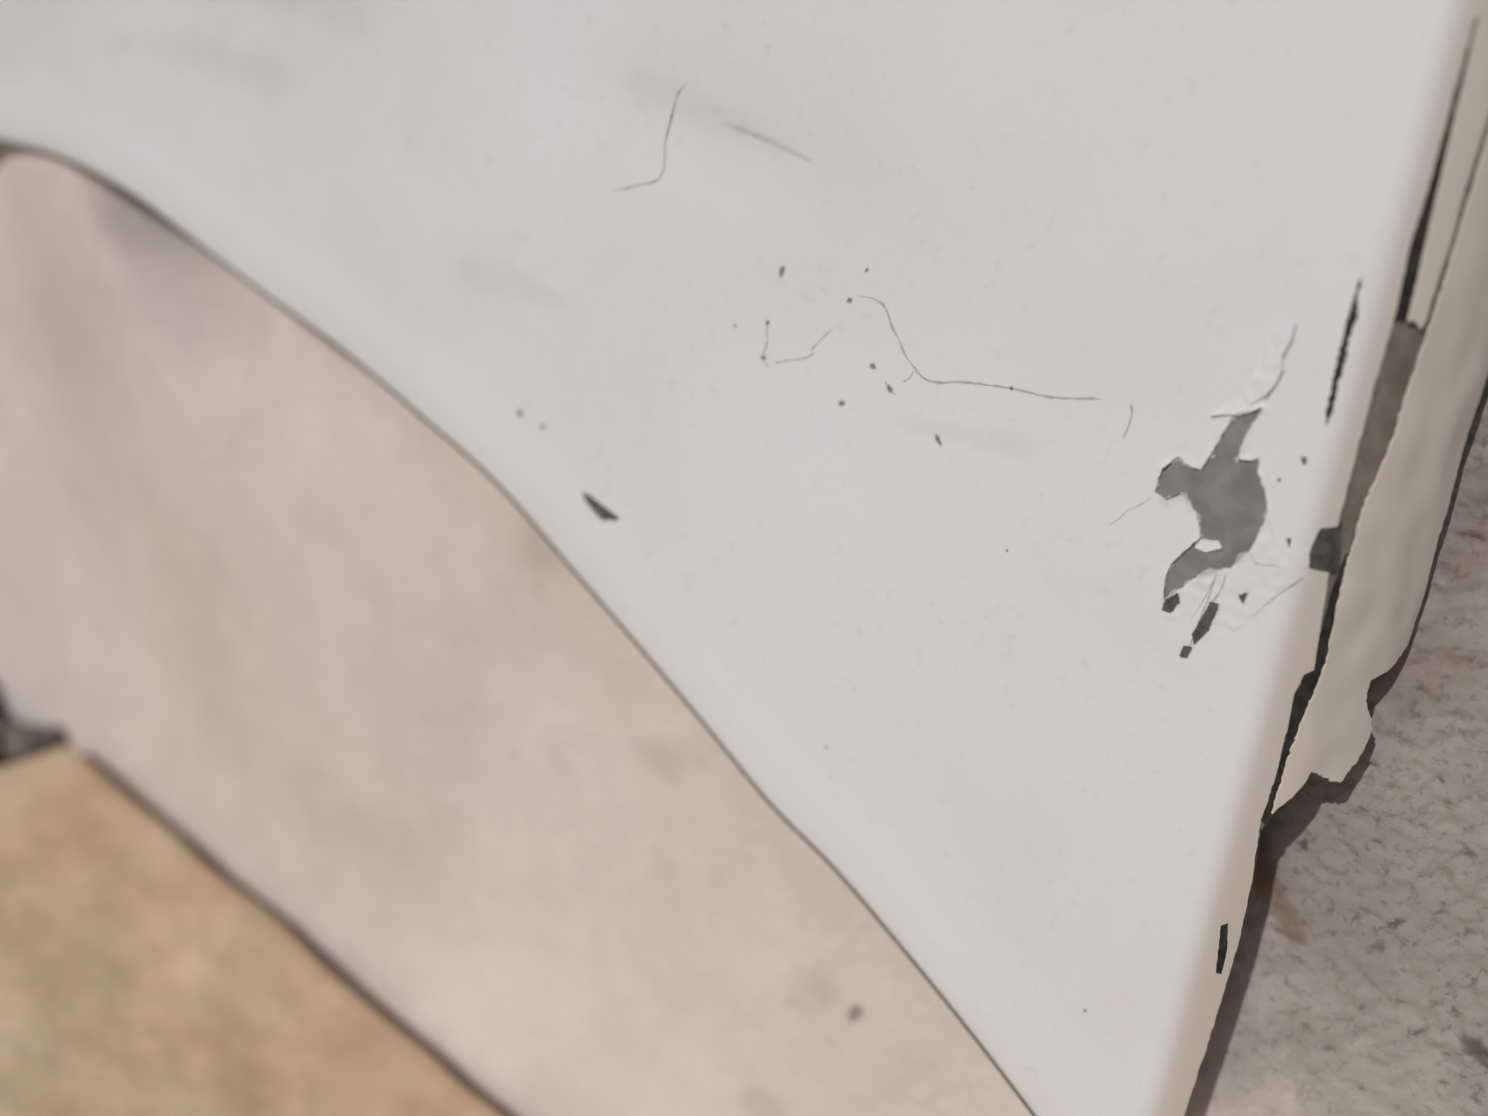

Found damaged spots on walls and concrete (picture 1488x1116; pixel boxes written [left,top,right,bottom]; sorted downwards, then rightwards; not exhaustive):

peeling [1155,17,1488,829]